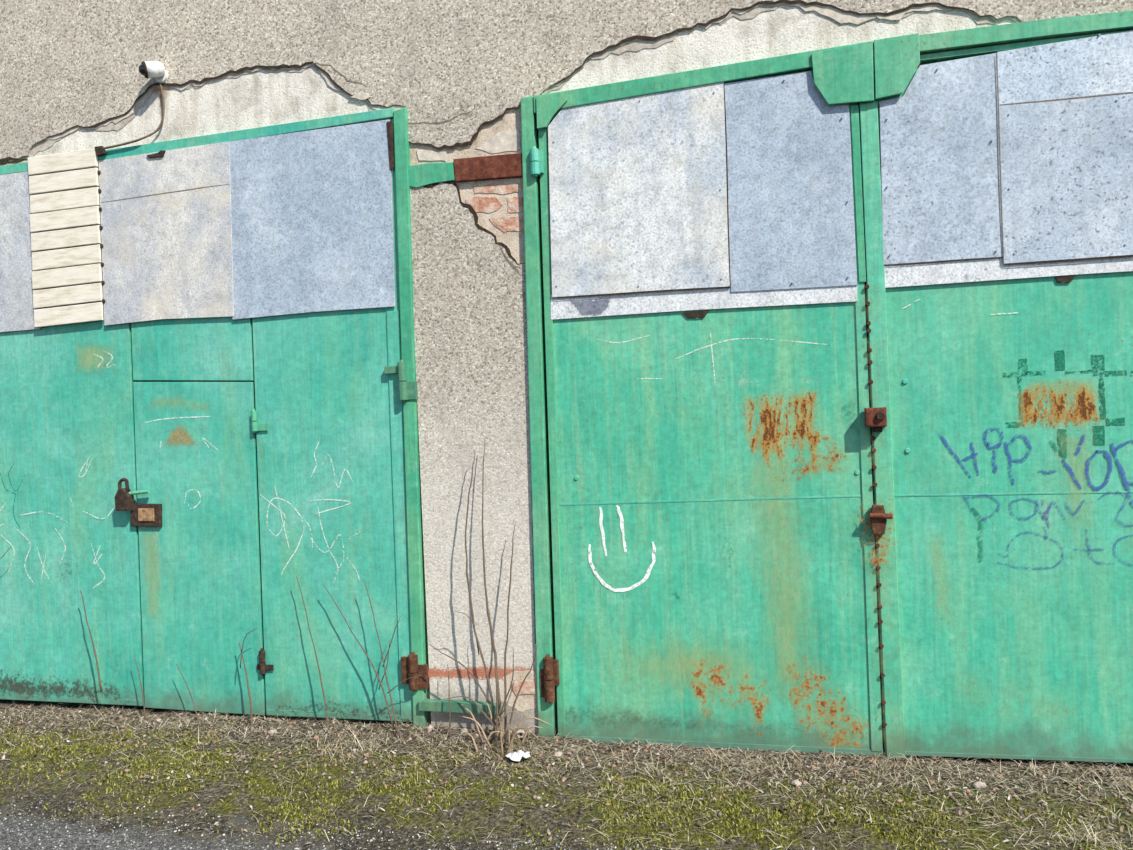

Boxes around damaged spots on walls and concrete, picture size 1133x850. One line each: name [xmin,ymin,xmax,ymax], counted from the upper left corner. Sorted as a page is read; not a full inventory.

spalling [541,0,1020,95]
spalling [0,61,405,166]
spalling [409,106,522,166]
spalling [423,177,525,265]
rust [744,392,847,481]
rust [1019,379,1100,427]
rust [858,481,897,571]
rust [682,653,769,736]
rust [781,656,888,749]